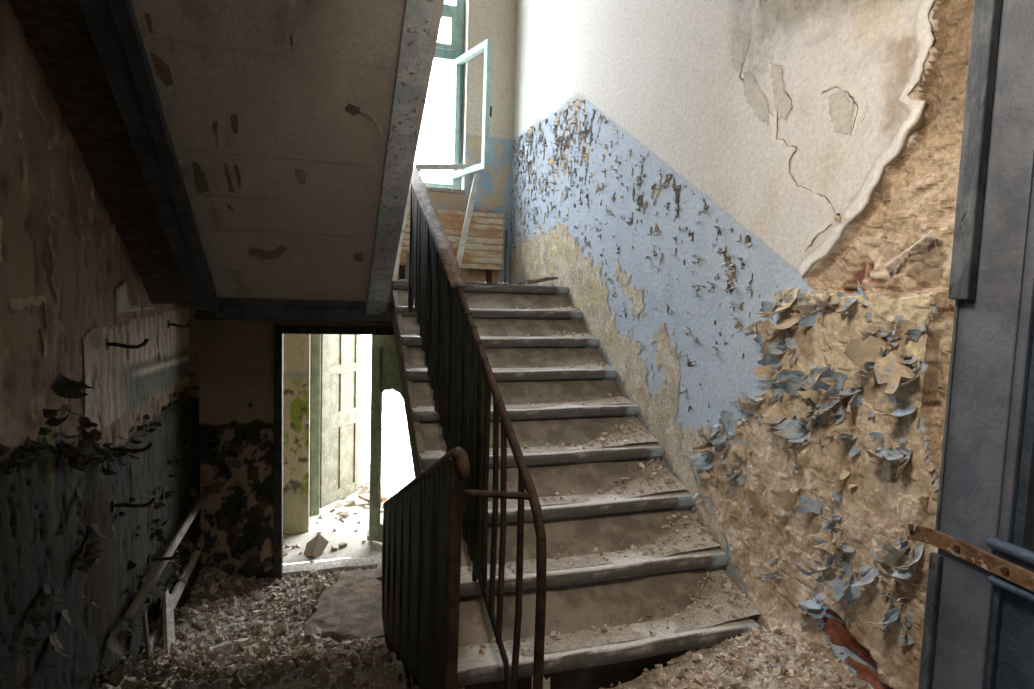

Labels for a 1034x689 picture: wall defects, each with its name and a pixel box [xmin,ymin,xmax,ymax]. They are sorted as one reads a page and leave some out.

peeling [192,161,242,211]
crack [735,38,837,252]
crack [822,75,870,138]
peeling [115,283,155,313]
peeling [464,0,974,689]
peeling [0,373,201,476]
peeling [75,445,203,685]
peeling [14,584,73,668]